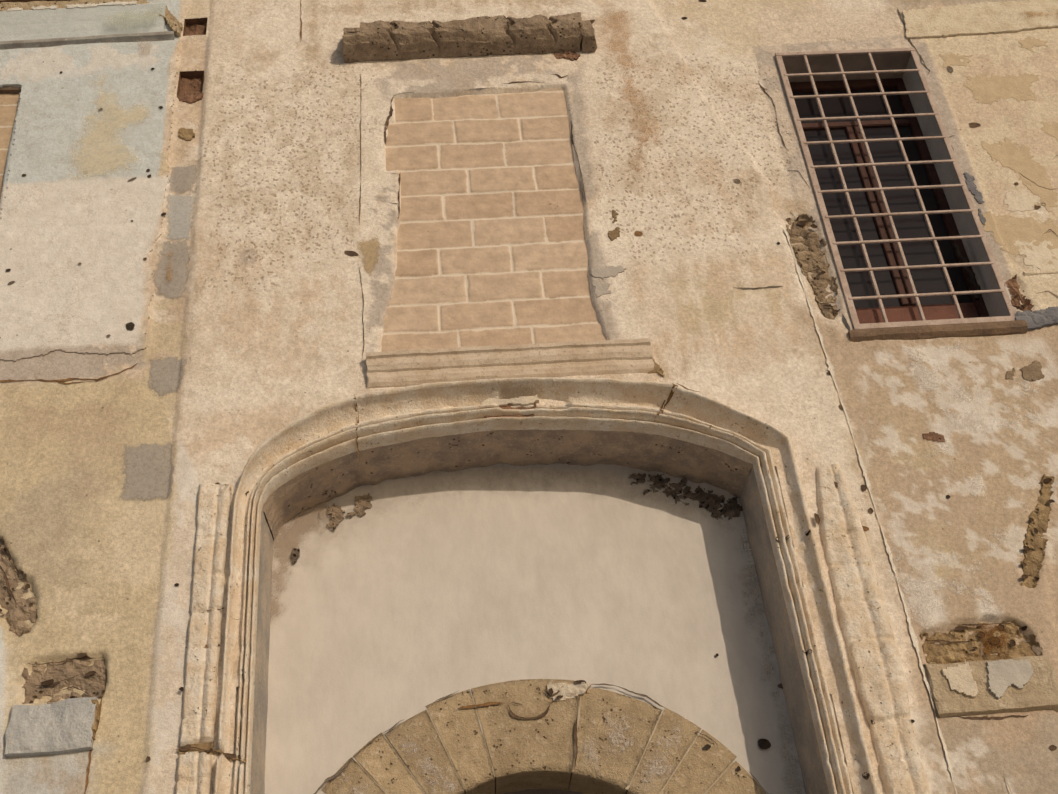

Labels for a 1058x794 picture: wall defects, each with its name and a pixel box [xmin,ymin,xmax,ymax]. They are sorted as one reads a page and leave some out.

peeling [976,137,1058,265]
spalling [786,214,840,320]
spalling [1004,274,1034,312]
crack [353,394,361,459]
crack [654,383,699,422]
spalling [326,493,372,532]
spalling [628,473,743,520]
spalling [1021,474,1055,588]
spalling [0,536,37,637]
spalling [920,620,1043,664]
spalling [22,652,107,743]
crack [84,684,106,794]